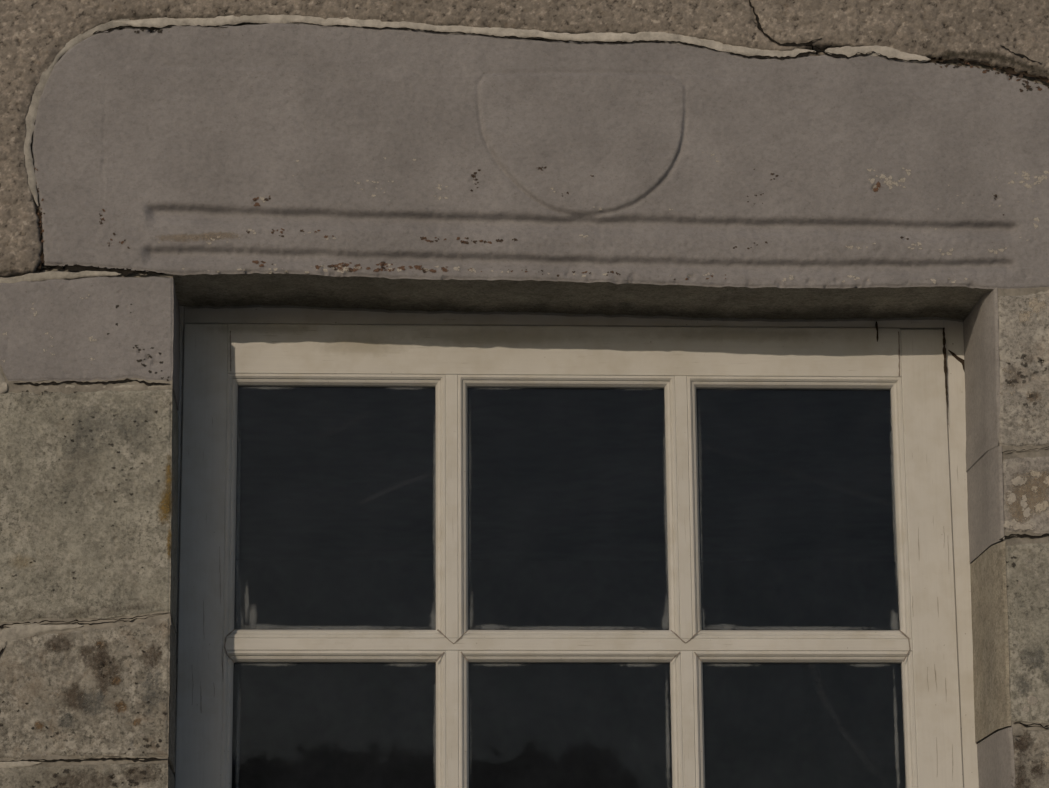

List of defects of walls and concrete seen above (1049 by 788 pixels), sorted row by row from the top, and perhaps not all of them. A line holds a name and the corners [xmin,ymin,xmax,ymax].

crack [292,0,1049,84]